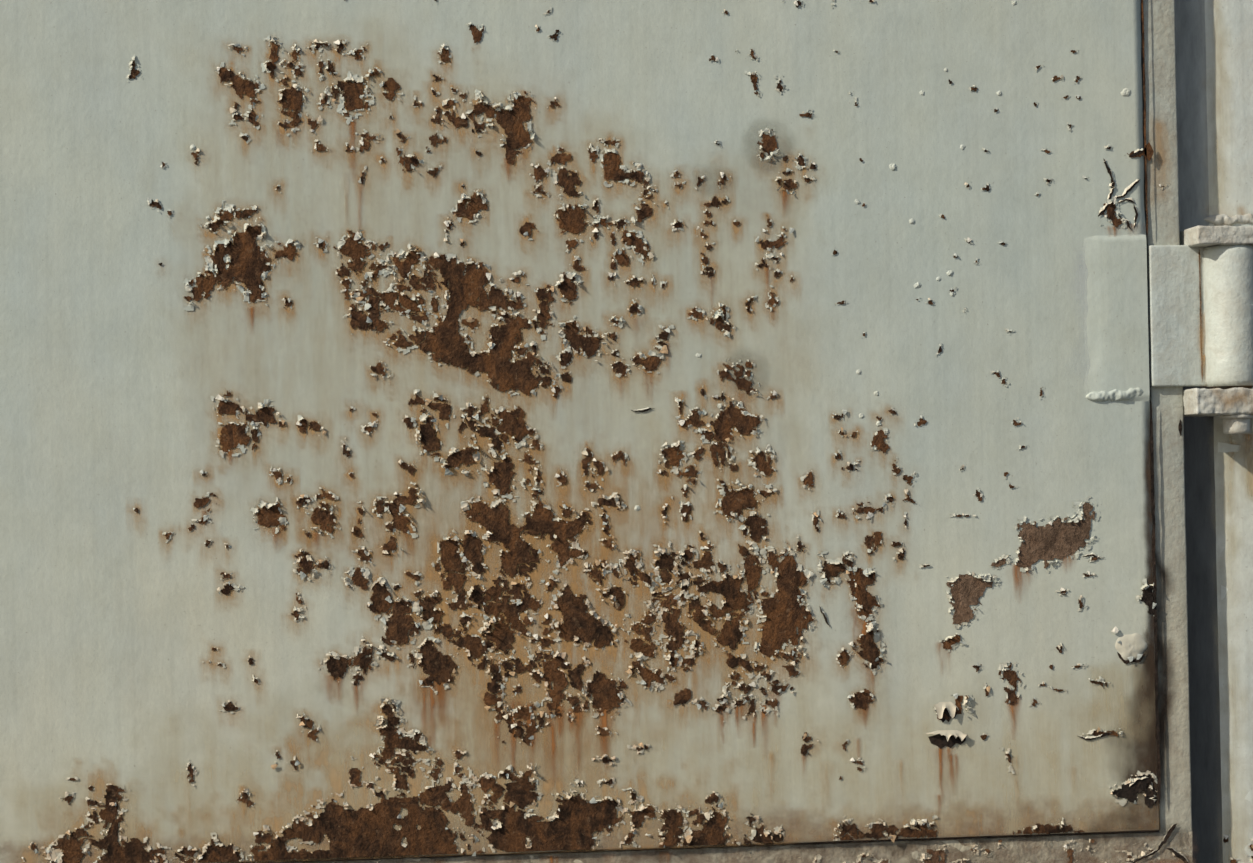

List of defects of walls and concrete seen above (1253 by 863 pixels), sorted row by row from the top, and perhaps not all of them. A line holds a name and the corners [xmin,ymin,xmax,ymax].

peeling [126,54,142,82]
rust [222,42,387,185]
rust [414,49,561,168]
peeling [147,198,174,218]
peeling [1100,197,1127,229]
peeling [183,35,916,746]
peeling [162,492,217,543]
rust [21,137,1161,863]
peeling [939,496,1105,653]
peeling [21,698,784,863]
peeling [801,732,819,756]
peeling [1108,770,1157,806]